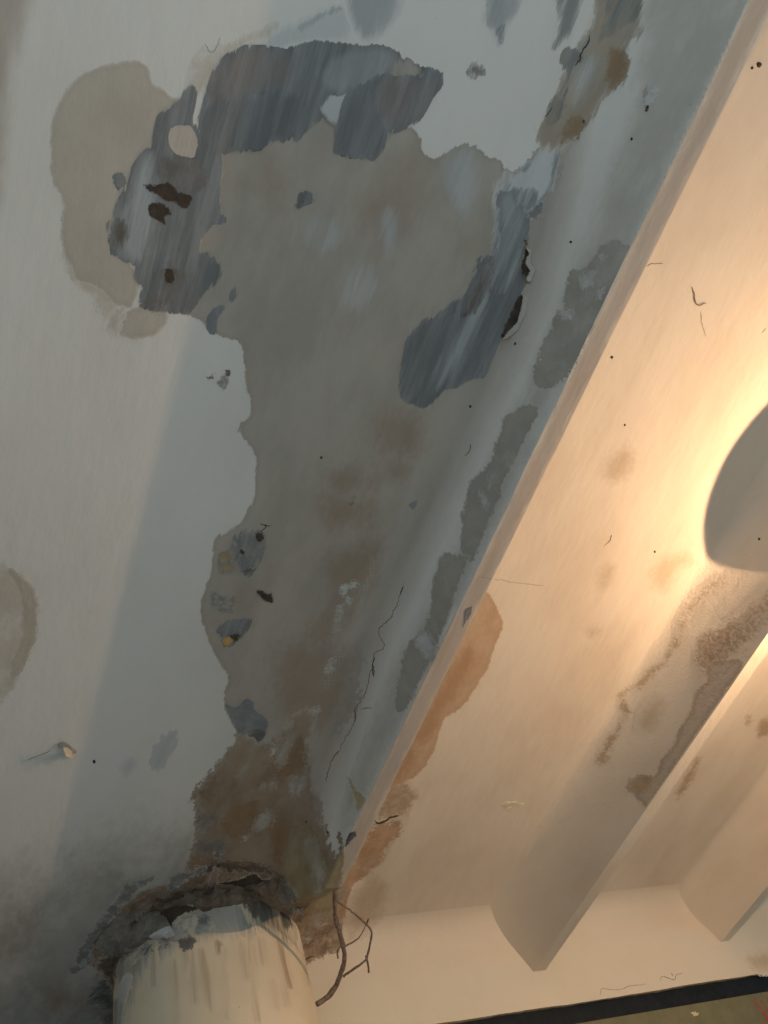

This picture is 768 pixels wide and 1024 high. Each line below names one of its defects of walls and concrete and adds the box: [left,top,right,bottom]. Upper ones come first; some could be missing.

damp [49,60,181,340]
peeling [205,287,237,335]
peeling [106,39,443,315]
peeling [398,190,541,409]
peeling [217,524,272,579]
damp [185,0,768,915]
crack [326,582,404,781]
flaking render [68,835,315,1024]